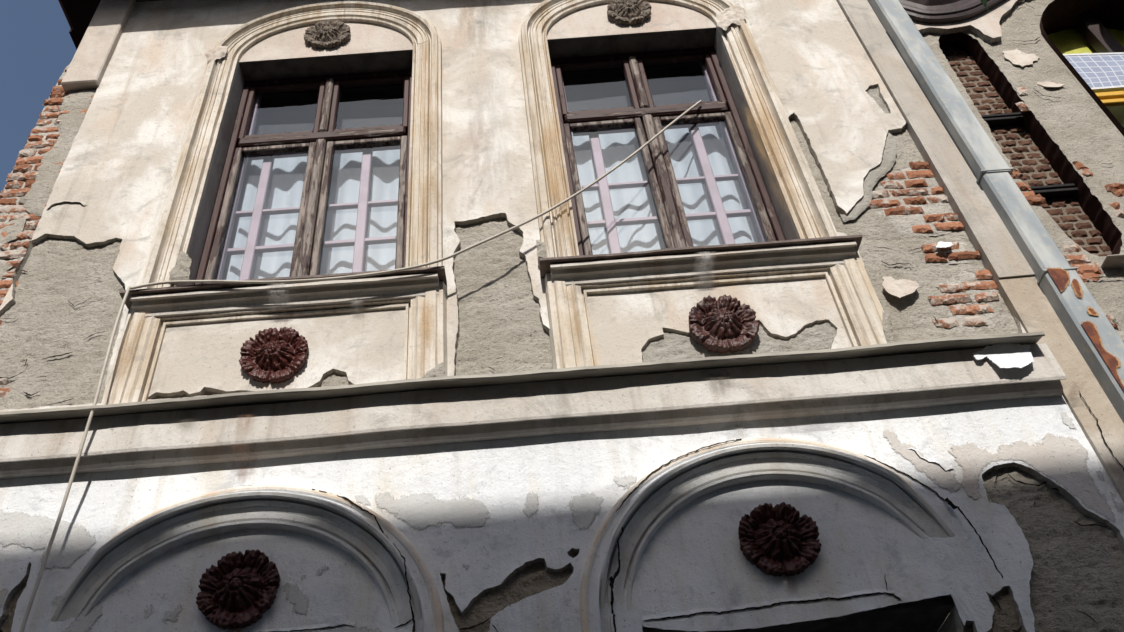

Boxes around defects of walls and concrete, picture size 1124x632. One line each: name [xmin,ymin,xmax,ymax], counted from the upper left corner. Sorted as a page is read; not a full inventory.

flaking render [865,83,891,113]
flaking render [0,64,125,410]
flaking render [422,213,553,378]
flaking render [641,319,837,362]
flaking render [788,113,1034,369]
rust [1046,267,1124,391]
crack [1078,390,1124,471]
peeling [0,509,96,632]
peeling [355,492,490,530]
flaking render [440,548,580,632]
crack [859,447,1003,579]
flaking render [883,412,1124,632]